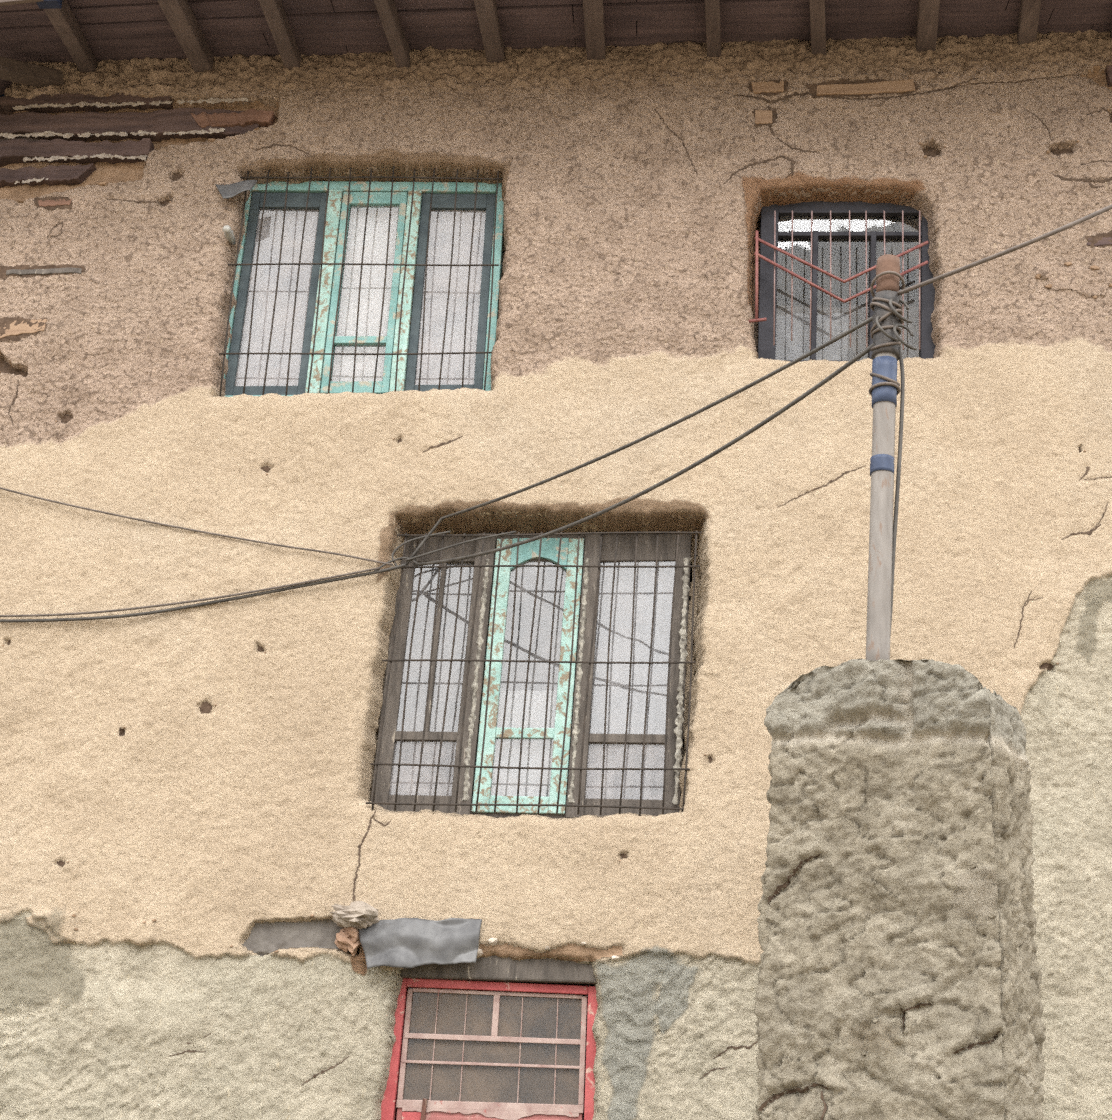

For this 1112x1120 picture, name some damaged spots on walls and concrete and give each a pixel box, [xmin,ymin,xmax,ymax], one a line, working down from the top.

spalling [7,93,279,125]
crack [724,74,1080,184]
spalling [0,127,225,210]
crack [1051,160,1112,188]
crack [353,810,390,902]
crack [767,854,821,905]
flaking render [25,912,78,945]
flaking render [124,919,157,947]
spalling [230,914,343,956]
crack [900,1003,932,1031]
crack [953,1031,1000,1054]
crack [758,1083,829,1120]